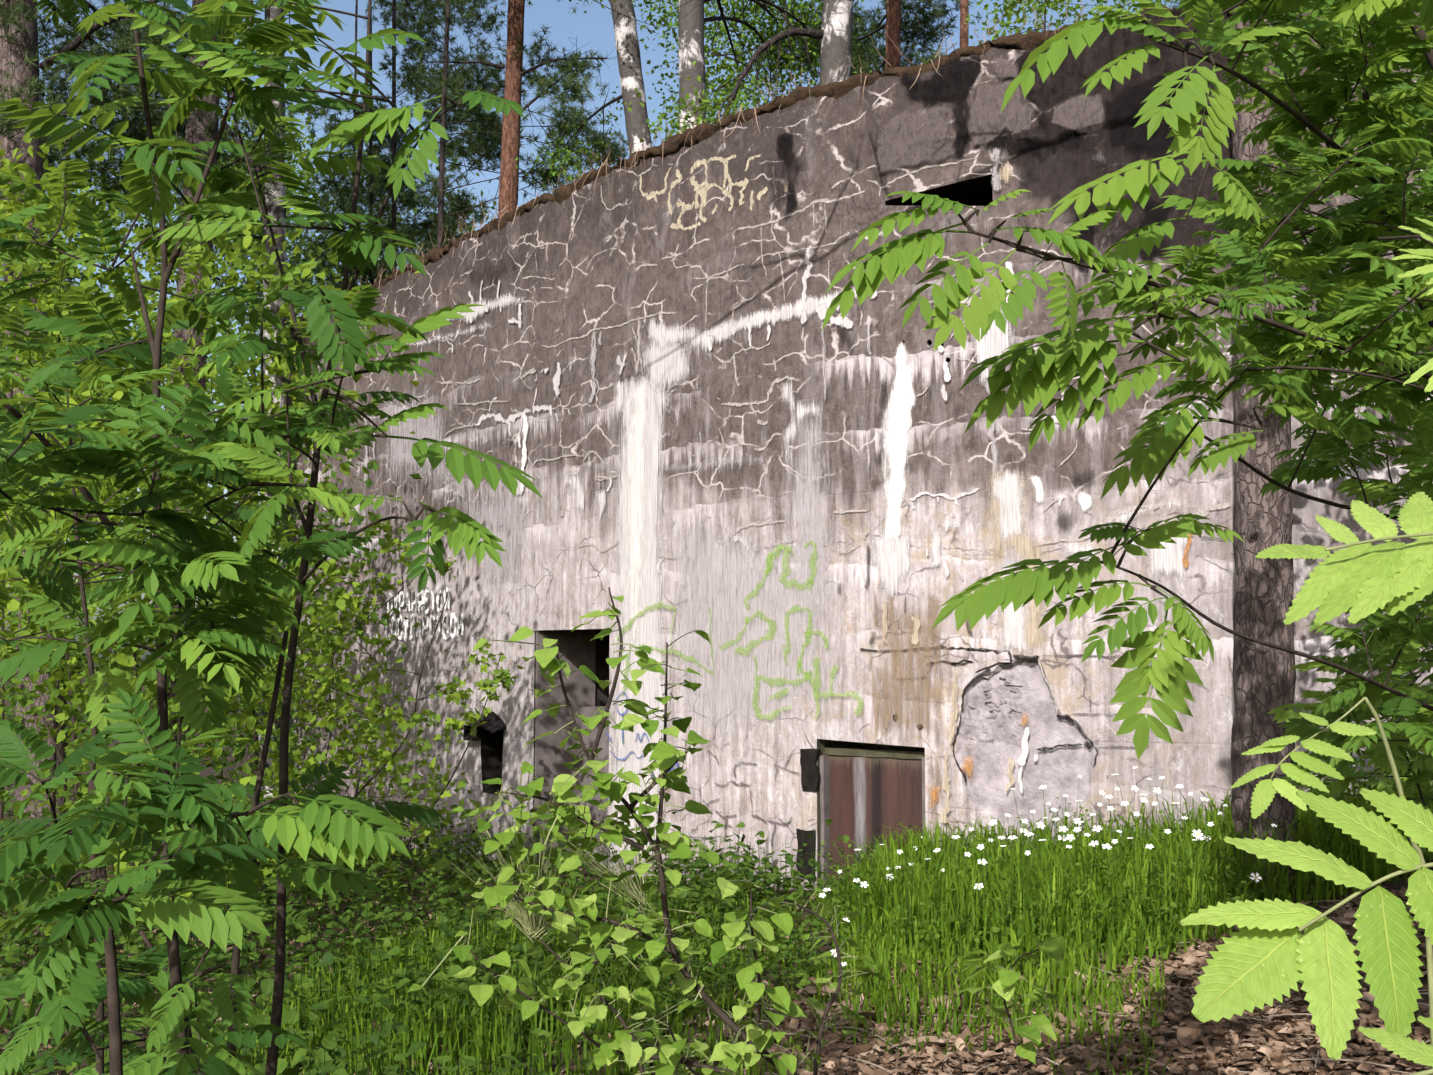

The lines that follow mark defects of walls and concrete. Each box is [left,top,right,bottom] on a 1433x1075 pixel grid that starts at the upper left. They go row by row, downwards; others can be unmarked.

water stain [900,53,981,158]
water stain [985,3,1234,273]
water stain [417,261,523,352]
water stain [535,362,571,396]
crack [409,154,991,481]
water stain [565,288,877,860]
water stain [865,343,915,613]
crack [833,488,979,539]
crack [991,421,1230,550]
crack [689,749,798,846]
crack [860,645,1157,785]
spalling [954,659,1100,830]